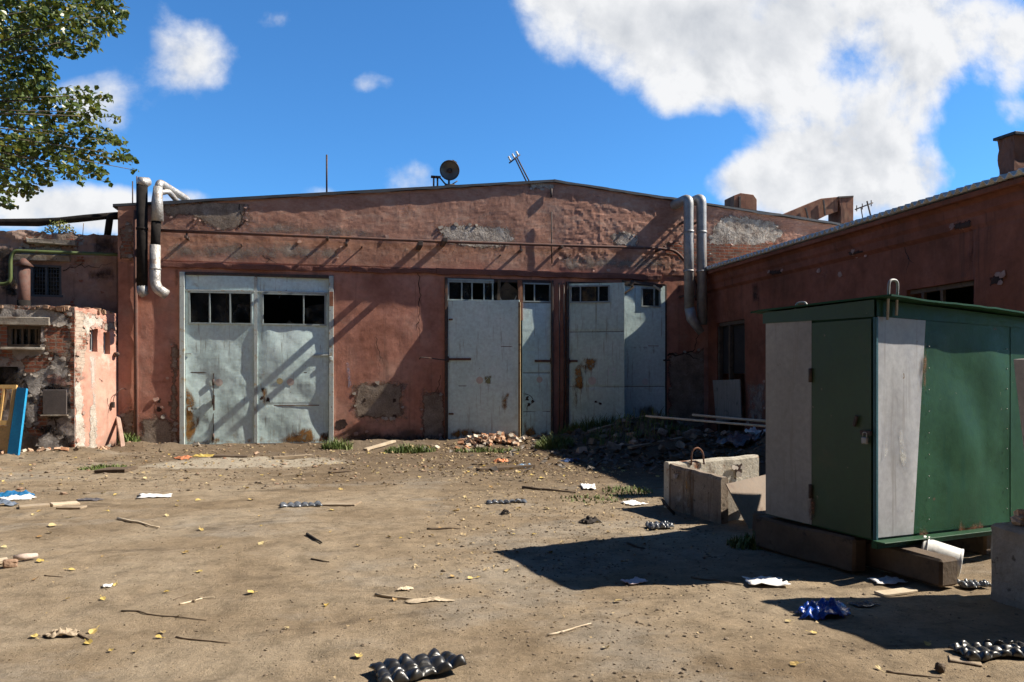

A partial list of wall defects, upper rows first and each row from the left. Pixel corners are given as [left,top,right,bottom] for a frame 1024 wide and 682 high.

flaking render [163,202,366,259]
spalling [438,222,515,249]
spalling [663,215,783,266]
flaking render [0,309,179,452]
spalling [351,381,407,433]